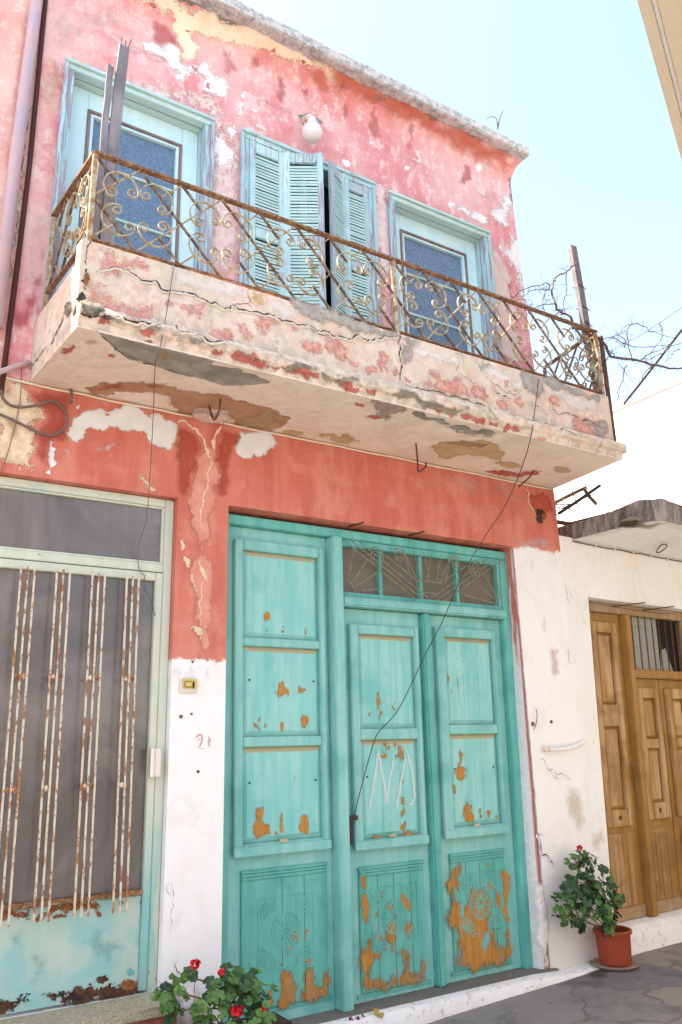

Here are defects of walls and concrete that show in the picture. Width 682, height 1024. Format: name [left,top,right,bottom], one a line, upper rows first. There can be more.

peeling [134,0,340,278]
peeling [375,184,390,278]
peeling [448,163,526,305]
spalling [64,241,270,386]
peeling [324,335,378,373]
crack [96,267,606,454]
peeling [0,373,45,472]
peeling [66,405,179,450]
peeling [234,430,303,459]
peeling [319,433,360,444]
peeling [356,389,522,468]
water stain [86,381,291,652]